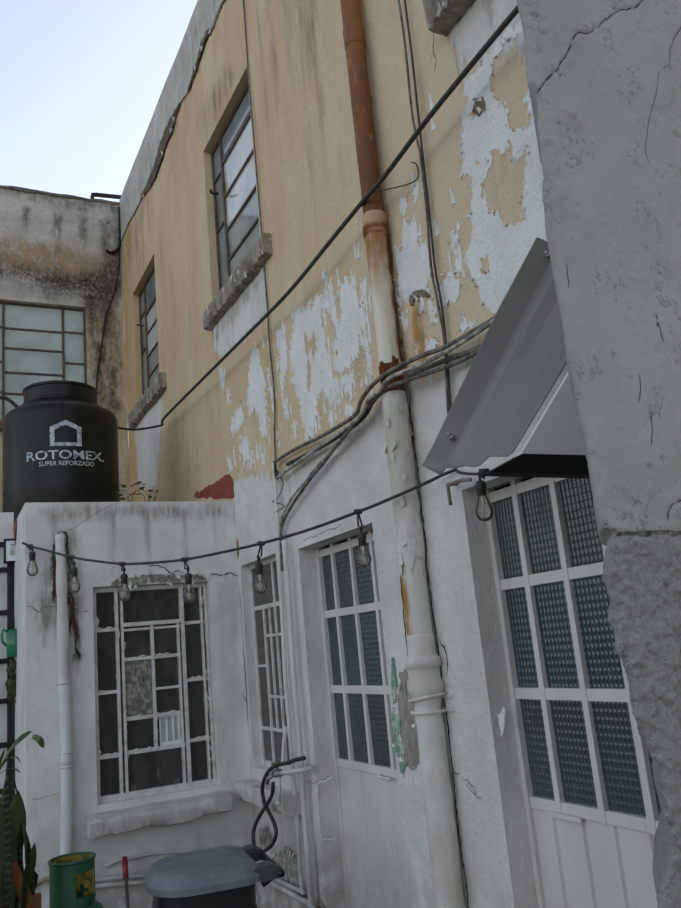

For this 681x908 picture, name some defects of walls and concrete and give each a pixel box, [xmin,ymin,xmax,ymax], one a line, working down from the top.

crack [537,1,642,93]
peeling [393,20,547,355]
damp [0,222,120,410]
peeling [218,241,426,577]
spalling [391,657,420,777]